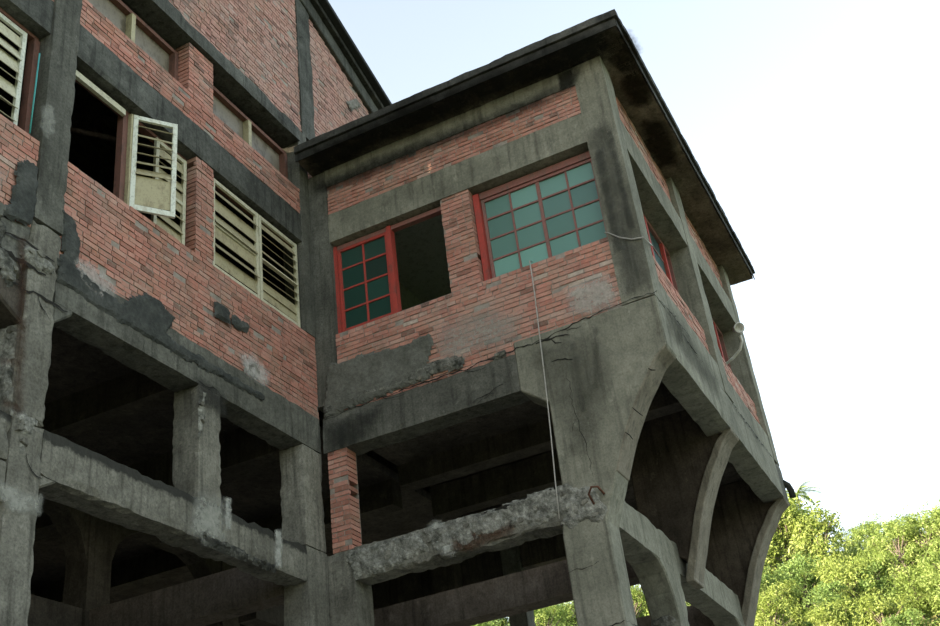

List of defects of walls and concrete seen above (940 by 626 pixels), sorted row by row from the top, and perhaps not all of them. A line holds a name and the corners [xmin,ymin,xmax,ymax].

damp [303,29,651,190]
damp [643,121,677,167]
spalling [0,221,55,288]
spalling [0,324,38,451]
spalling [197,388,206,438]
spalling [323,356,465,417]
crack [325,291,697,474]
spalling [196,531,276,573]
spalling [346,483,608,580]